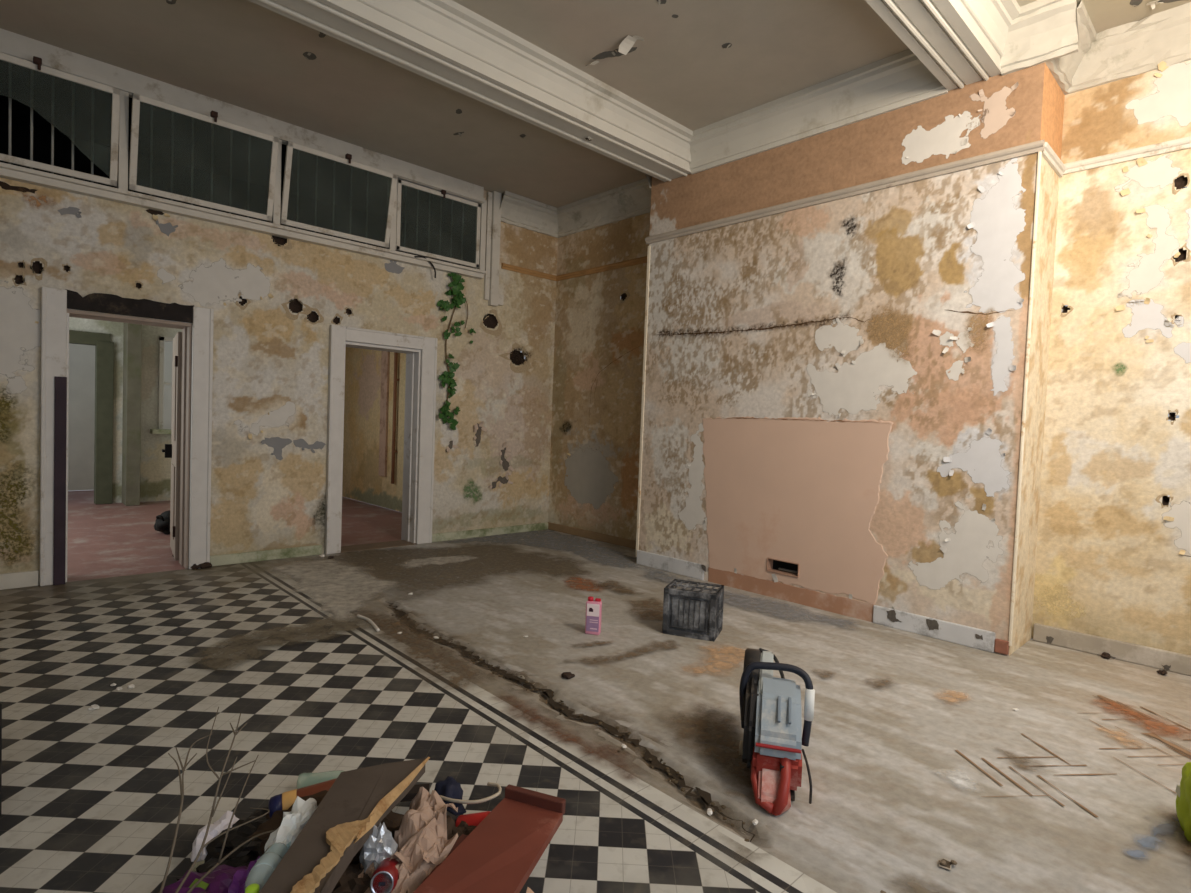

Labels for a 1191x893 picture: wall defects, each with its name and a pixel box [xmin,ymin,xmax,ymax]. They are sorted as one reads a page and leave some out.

peeling [587,35,644,66]
peeling [902,81,1019,165]
peeling [1125,61,1191,126]
peeling [1114,154,1190,196]
peeling [0,258,48,394]
crack [588,317,889,429]
peeling [932,327,974,381]
crack [950,308,1011,316]
peeling [964,158,1026,396]
peeling [1115,204,1191,363]
water stain [0,469,32,562]
crack [387,602,755,842]